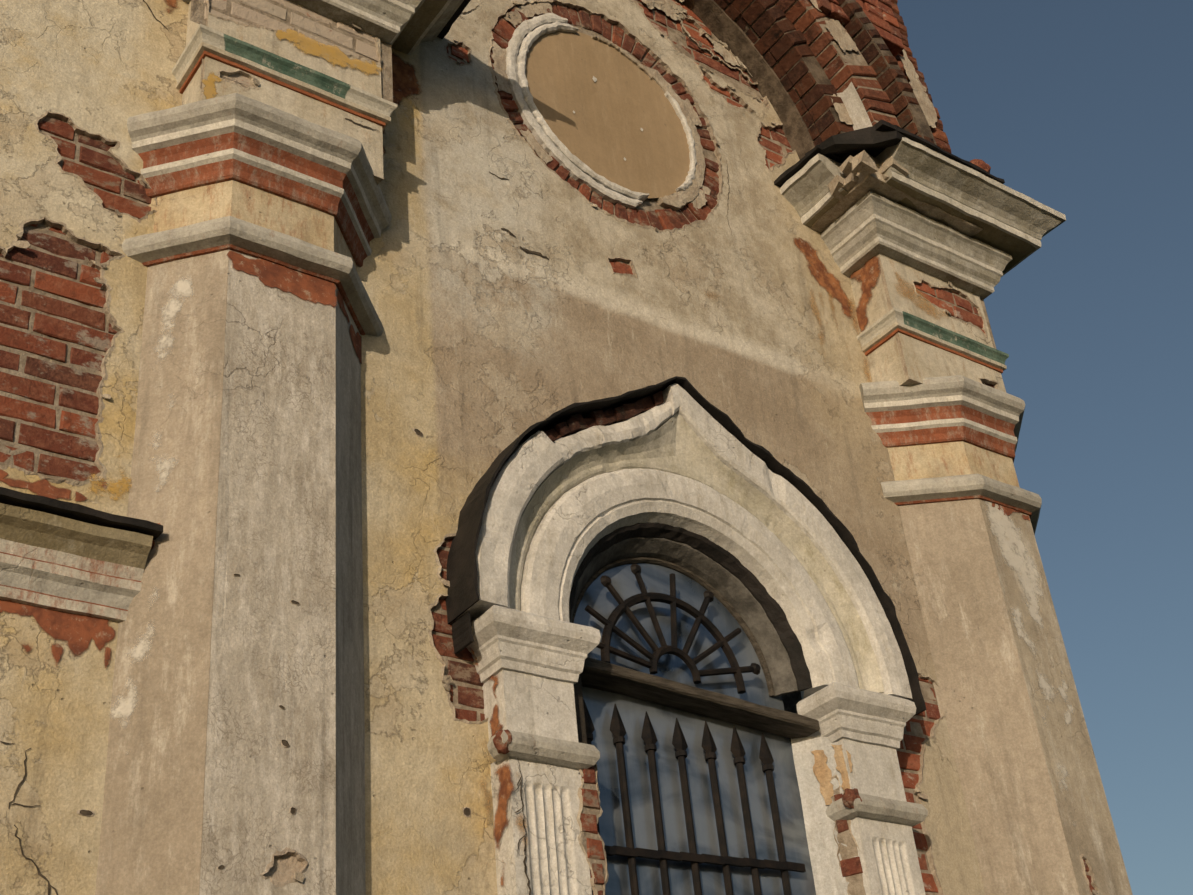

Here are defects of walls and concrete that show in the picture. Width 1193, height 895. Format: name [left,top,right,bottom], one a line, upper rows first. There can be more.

spalling [35,111,158,223]
spalling [190,0,393,102]
spalling [444,39,473,66]
spalling [487,0,724,233]
spalling [632,0,796,172]
spalling [0,216,126,486]
spalling [428,533,488,724]
crack [0,741,58,895]
spalling [259,847,309,887]
crack [515,758,531,895]
spalling [833,819,866,895]
spalling [896,671,946,895]